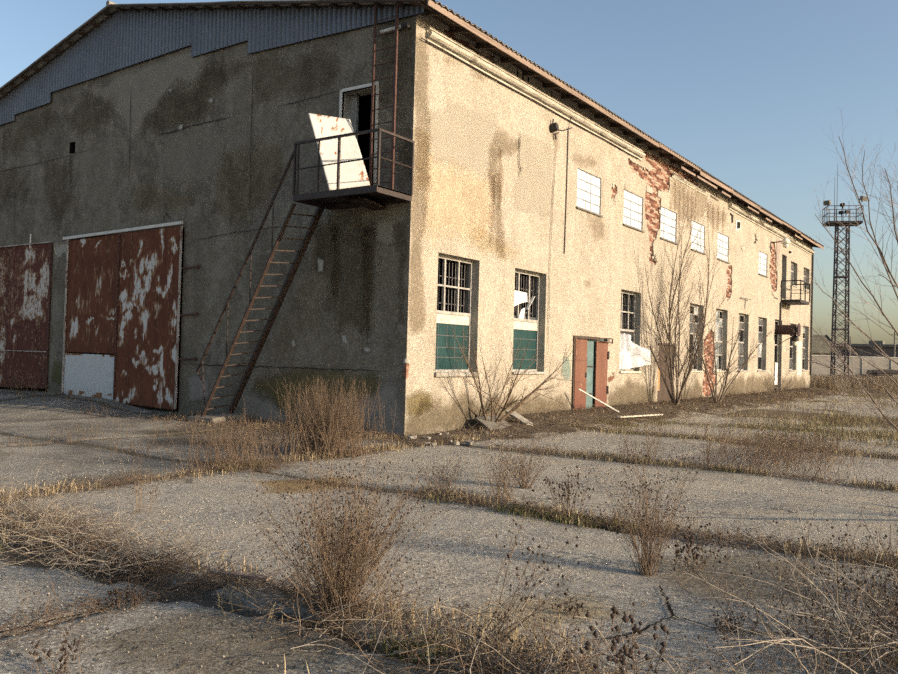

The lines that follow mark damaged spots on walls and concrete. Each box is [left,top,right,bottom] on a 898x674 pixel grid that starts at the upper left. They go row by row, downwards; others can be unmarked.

flaking render [628,142,698,266]
flaking render [769,240,778,293]
flaking render [702,329,716,397]